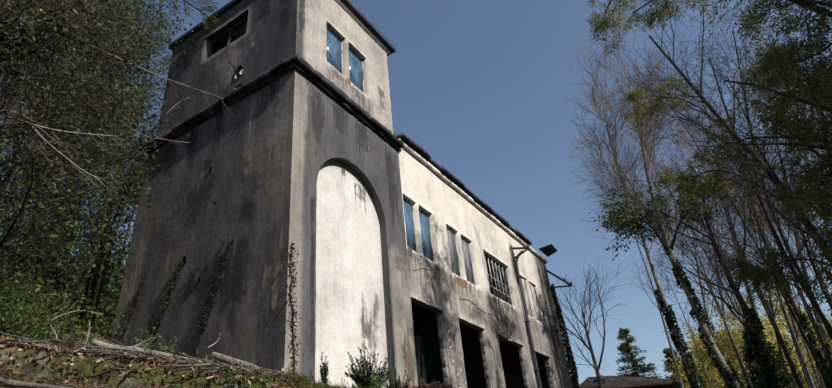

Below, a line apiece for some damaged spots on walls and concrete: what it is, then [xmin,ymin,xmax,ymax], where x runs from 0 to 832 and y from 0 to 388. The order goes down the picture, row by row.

damp [362,295,379,348]